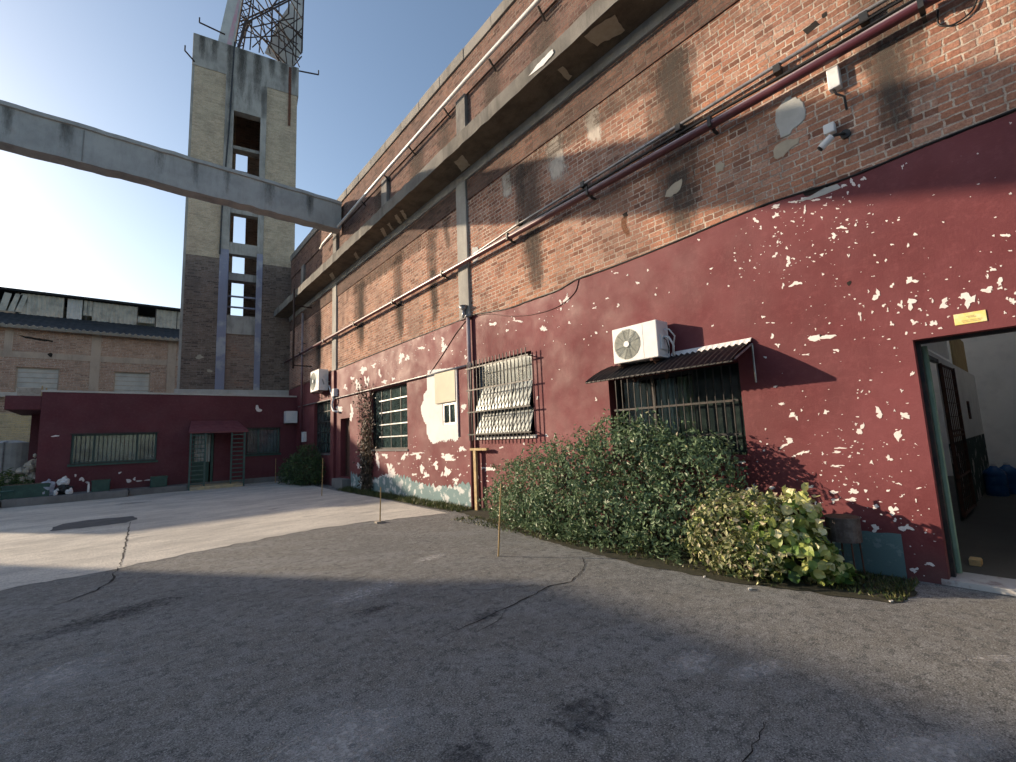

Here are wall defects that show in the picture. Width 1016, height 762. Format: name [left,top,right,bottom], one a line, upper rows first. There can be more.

leakage [502,50,693,279]
peeling [734,176,874,289]
peeling [835,265,1016,335]
peeling [337,353,410,394]
peeling [794,317,843,362]
peeling [371,436,495,485]